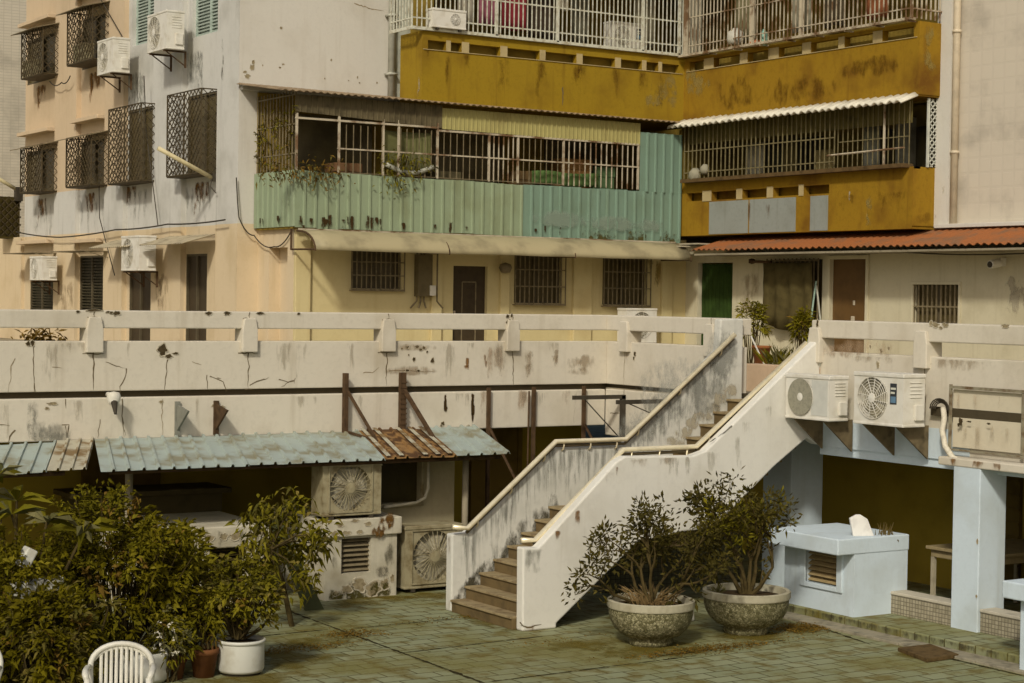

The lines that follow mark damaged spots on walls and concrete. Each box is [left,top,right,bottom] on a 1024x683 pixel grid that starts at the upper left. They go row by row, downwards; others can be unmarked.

corrosion [194,182,209,208]
corrosion [299,215,381,229]
spalling [156,342,179,359]
crack [193,352,295,390]
crack [82,353,127,436]
crack [160,360,168,435]
spalling [334,573,395,597]